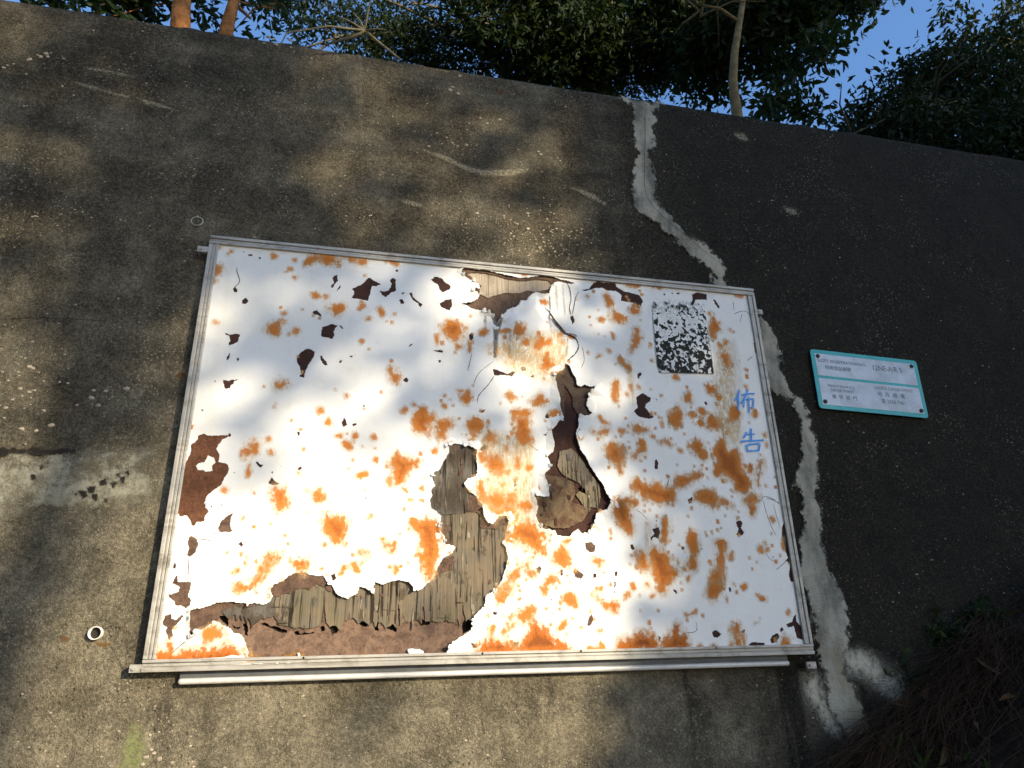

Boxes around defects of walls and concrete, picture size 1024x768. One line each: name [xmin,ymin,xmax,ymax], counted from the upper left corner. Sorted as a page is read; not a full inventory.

corrosion [263,306,300,337]
corrosion [284,254,367,279]
corrosion [302,292,396,323]
corrosion [462,268,573,284]
corrosion [586,284,652,403]
peeling [178,433,235,557]
corrosion [240,436,274,478]
corrosion [317,312,777,652]
crack [620,95,911,748]
peeling [162,563,216,640]
corrosion [153,485,371,660]